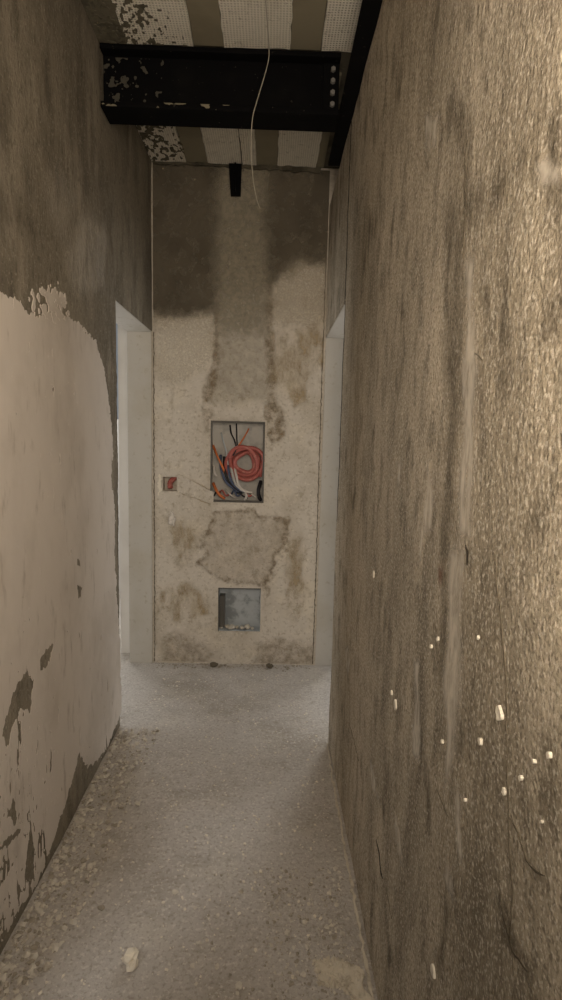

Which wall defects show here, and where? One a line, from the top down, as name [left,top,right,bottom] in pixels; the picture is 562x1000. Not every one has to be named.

water stain [136,125,330,380]
peeling [0,281,122,941]
crack [493,552,545,988]